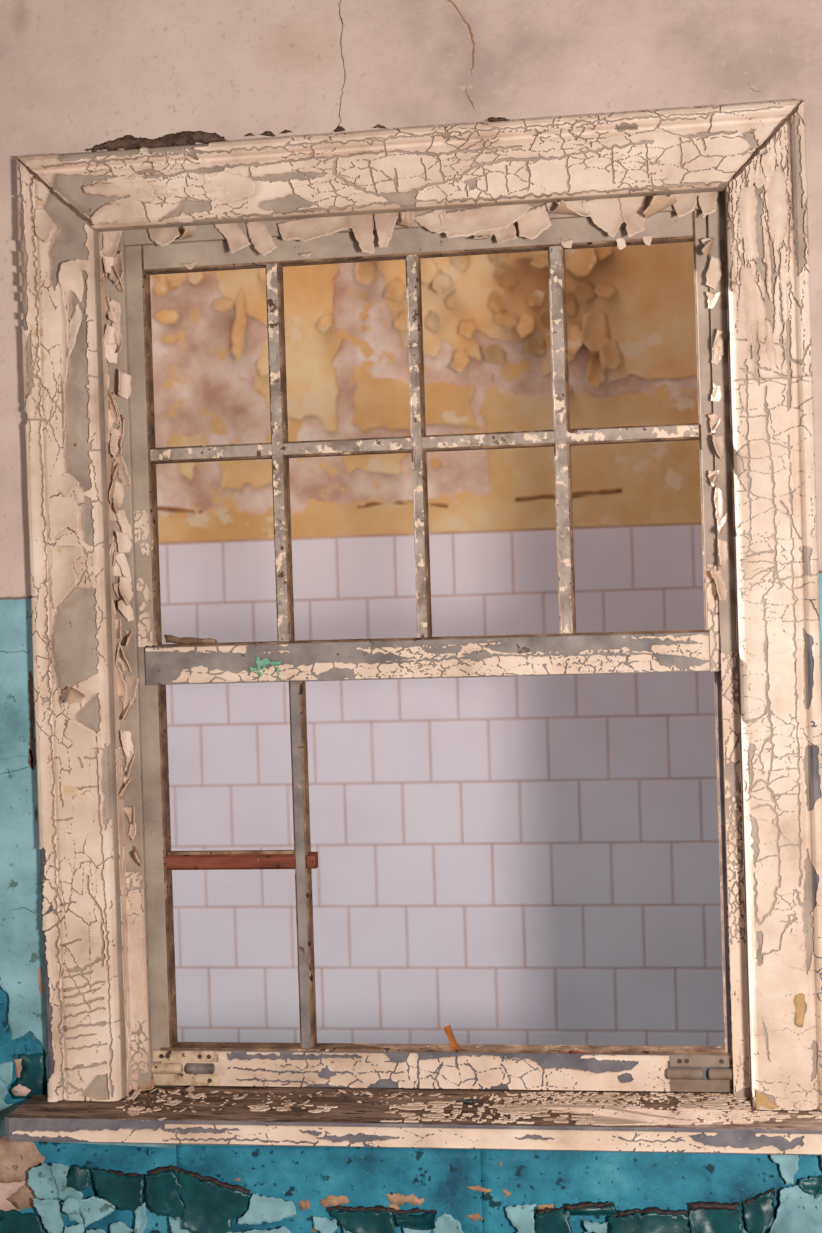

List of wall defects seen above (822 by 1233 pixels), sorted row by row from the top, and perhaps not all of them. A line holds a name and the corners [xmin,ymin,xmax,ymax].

crack [334,1,346,131]
crack [447,0,475,108]
peeling [17,99,808,248]
peeling [106,368,254,720]
peeling [0,159,124,1111]
peeling [148,123,822,1125]
peeling [116,730,154,1099]
peeling [116,1098,163,1116]
peeling [0,1117,822,1233]